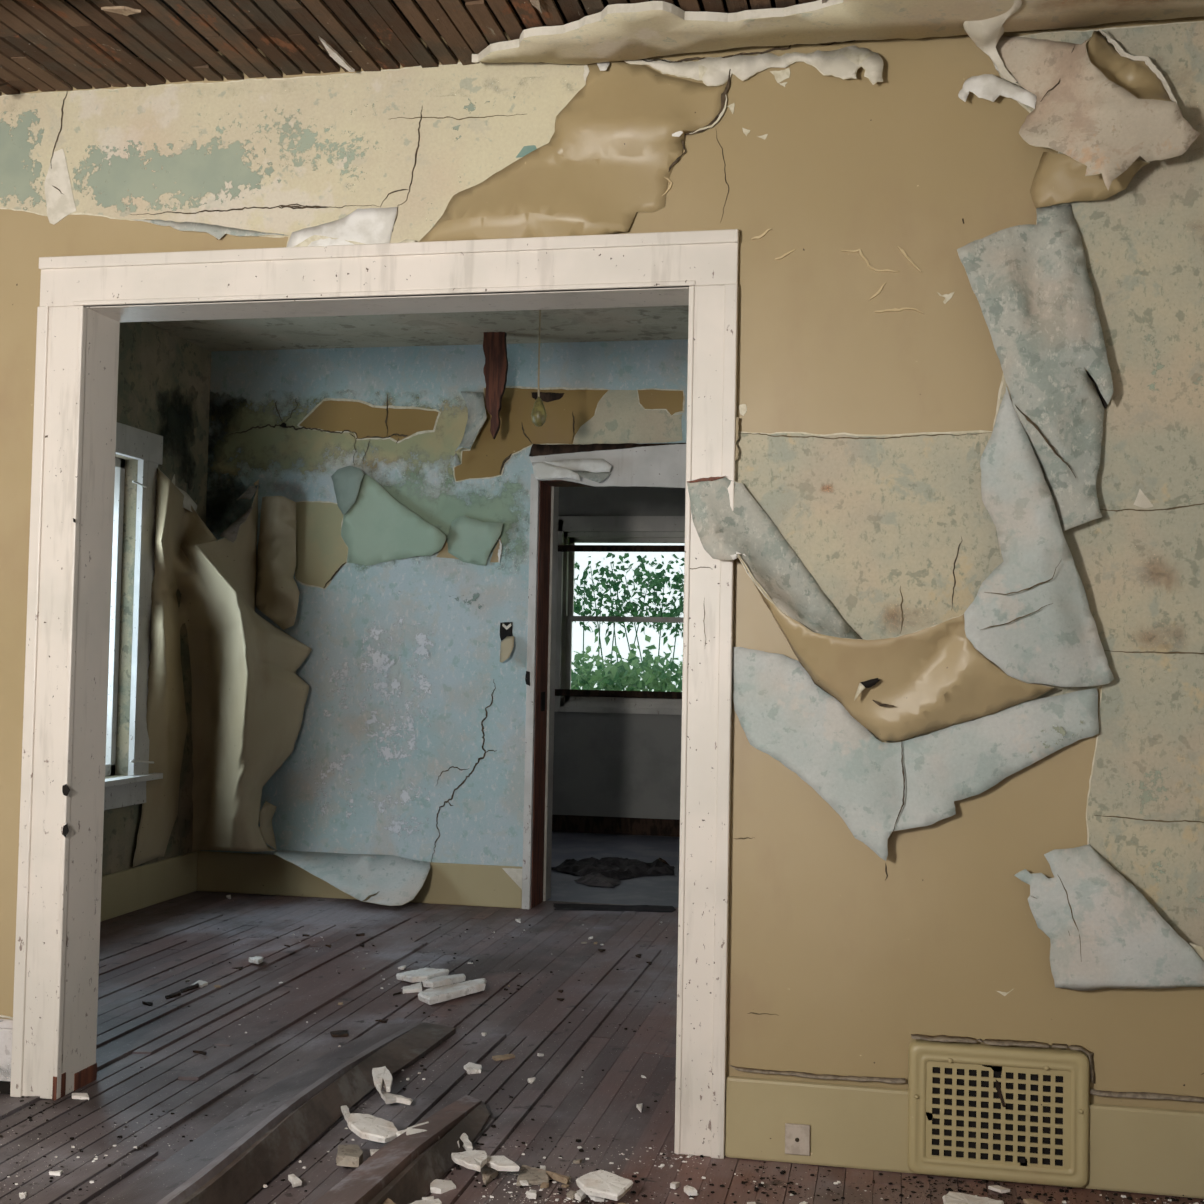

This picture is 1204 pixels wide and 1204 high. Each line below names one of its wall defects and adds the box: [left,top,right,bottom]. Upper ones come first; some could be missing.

crack [130,110,524,232]
water stain [160,390,245,531]
peeling [0,0,1204,948]
crack [431,680,497,862]